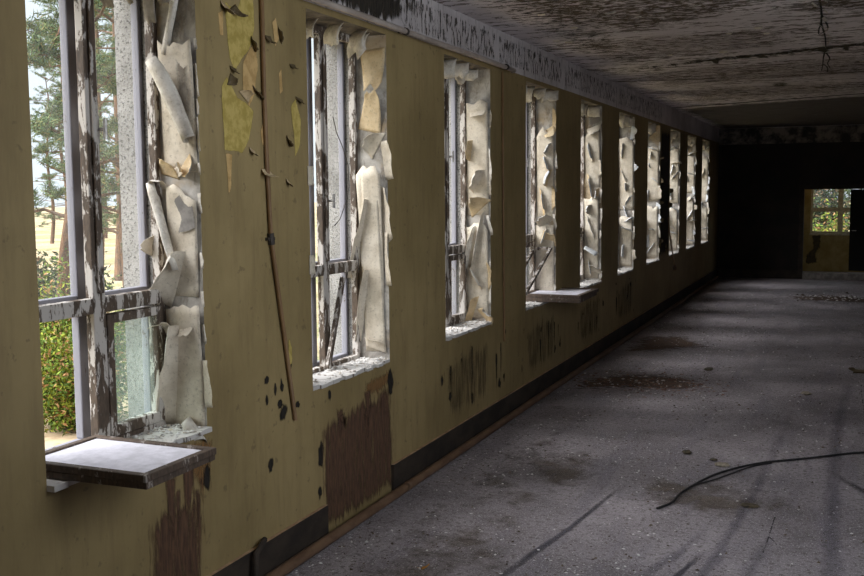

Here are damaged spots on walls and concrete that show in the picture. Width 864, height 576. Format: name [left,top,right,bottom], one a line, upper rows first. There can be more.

peeling [127,0,213,443]
peeling [306,18,394,353]
peeling [462,99,493,326]
peeling [402,0,617,291]
peeling [481,0,791,61]
peeling [619,114,710,266]
crack [811,0,830,71]
water stain [193,463,210,490]